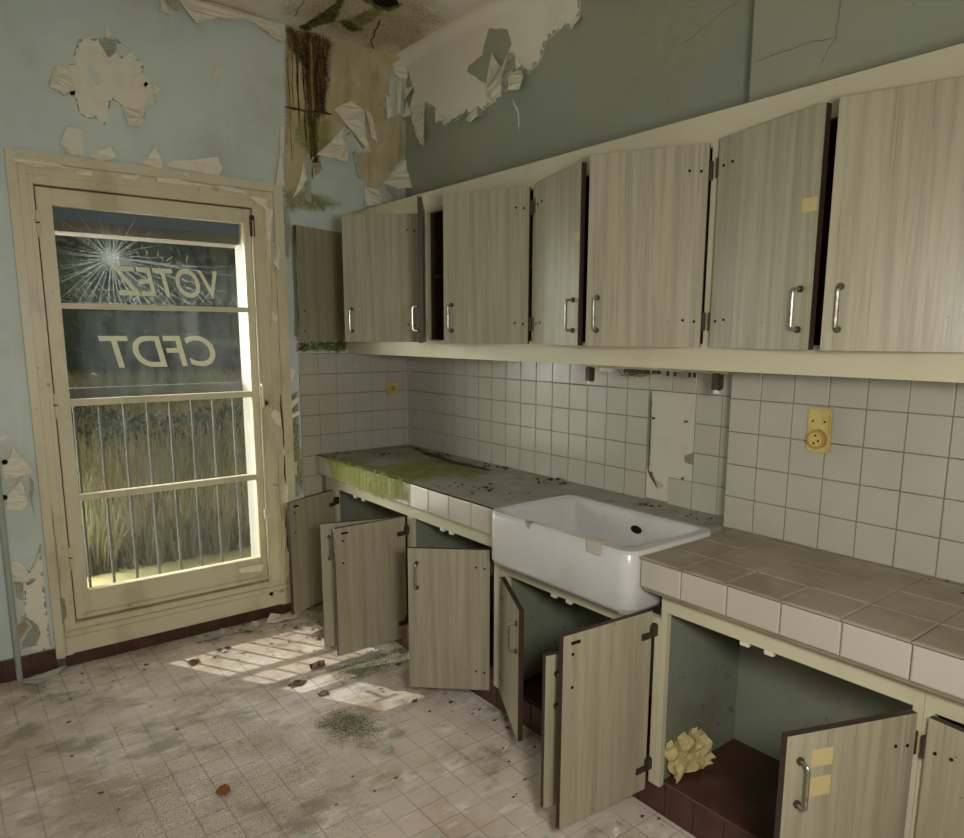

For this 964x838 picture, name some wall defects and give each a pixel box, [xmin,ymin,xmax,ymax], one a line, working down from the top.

peeling [49,25,162,128]
leakage [264,0,458,214]
peeling [160,0,581,146]
crack [756,0,841,67]
peeling [0,433,35,515]
peeling [646,391,697,502]
peeling [0,544,51,651]